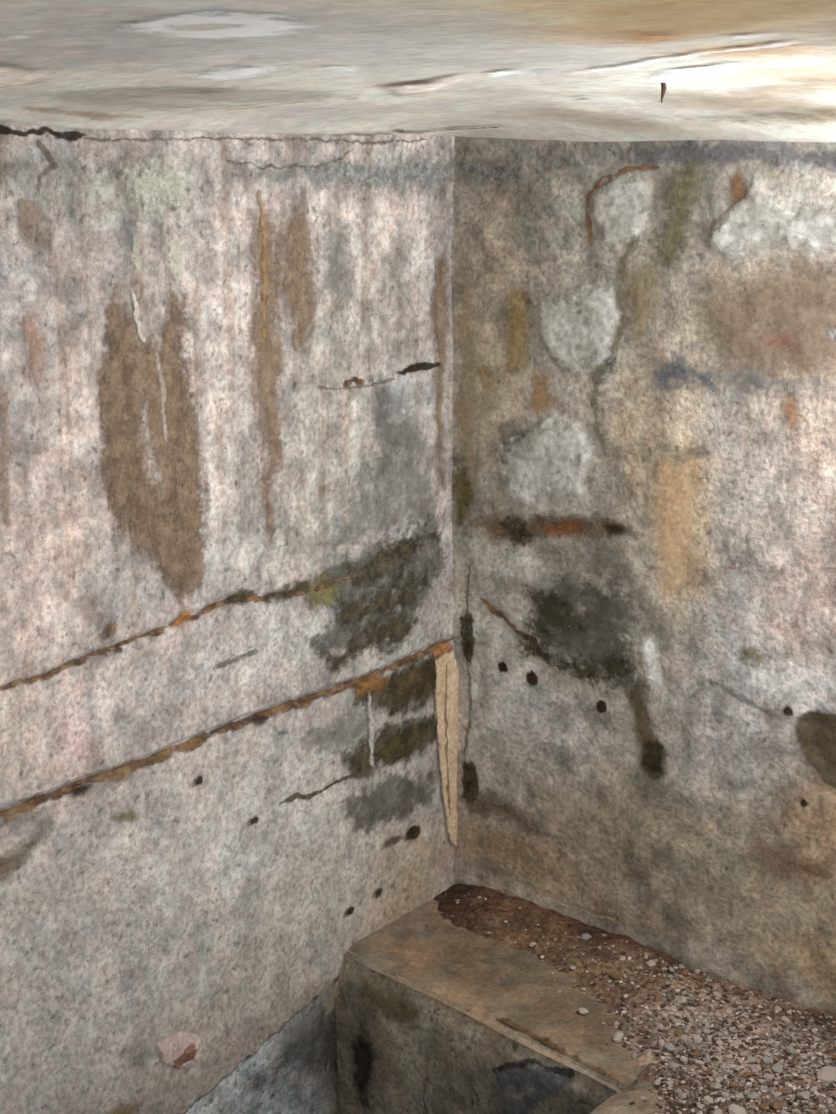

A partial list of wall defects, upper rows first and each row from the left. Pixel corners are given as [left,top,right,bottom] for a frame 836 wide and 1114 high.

crack [0,125,498,195]
rust [706,112,836,124]
water stain [97,286,210,599]
water stain [250,190,320,541]
crack [319,362,441,390]
water stain [431,257,496,525]
water stain [306,514,446,673]
rust [477,513,625,545]
water stain [280,649,451,833]
water stain [480,572,665,778]
water stain [708,680,780,719]
water stain [796,711,836,788]